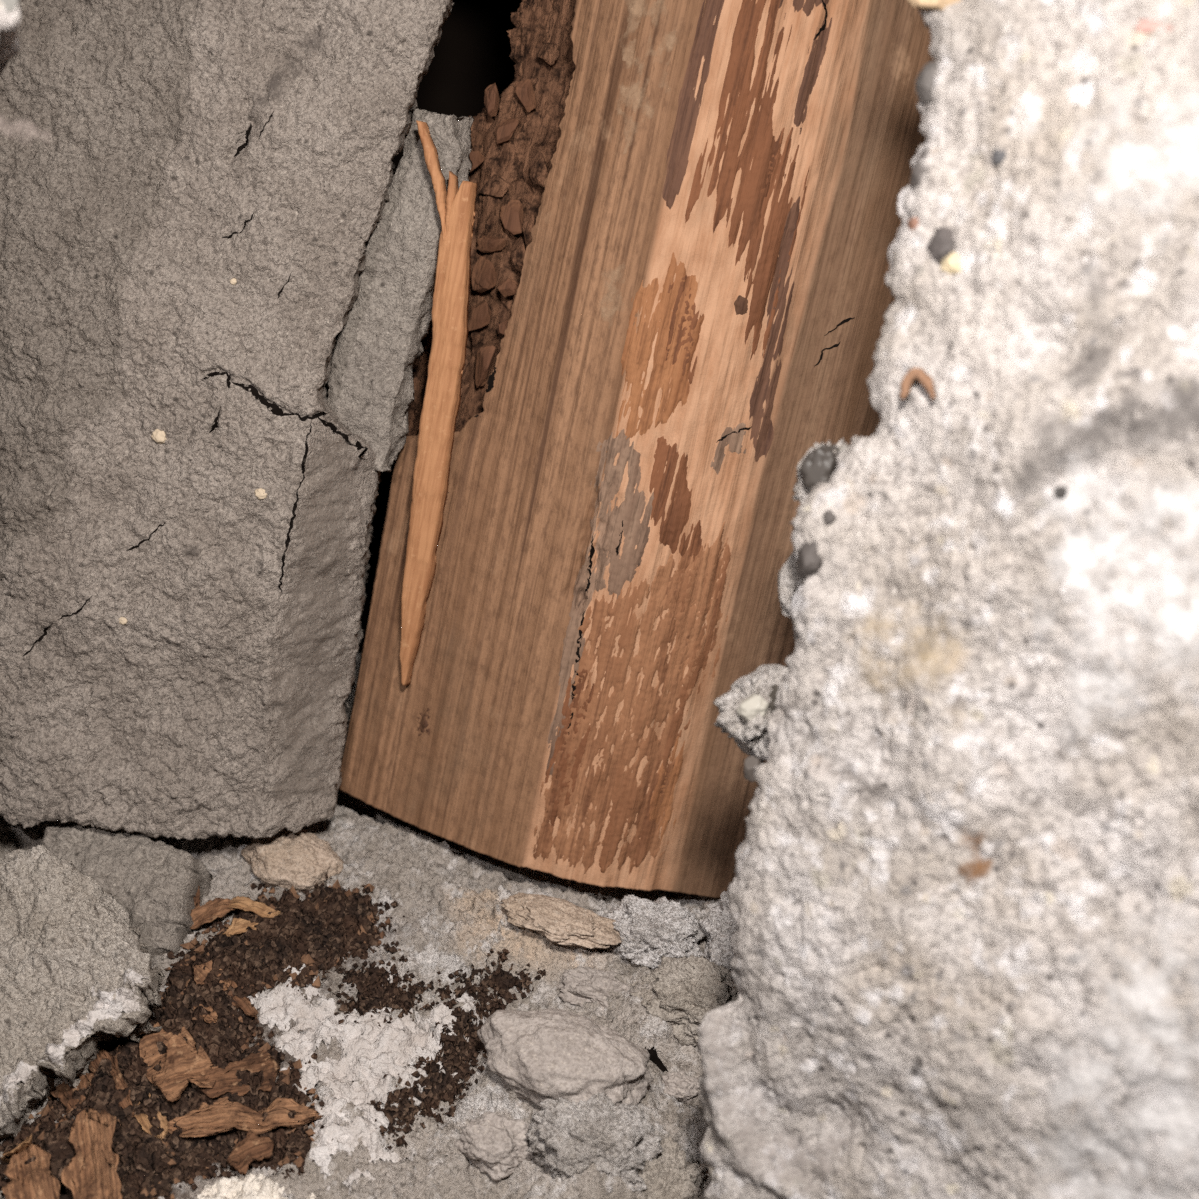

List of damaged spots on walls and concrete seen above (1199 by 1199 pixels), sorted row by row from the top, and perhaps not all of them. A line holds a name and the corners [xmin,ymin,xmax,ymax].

crack [222,210,255,239]
crack [126,522,165,551]
crack [22,596,92,657]